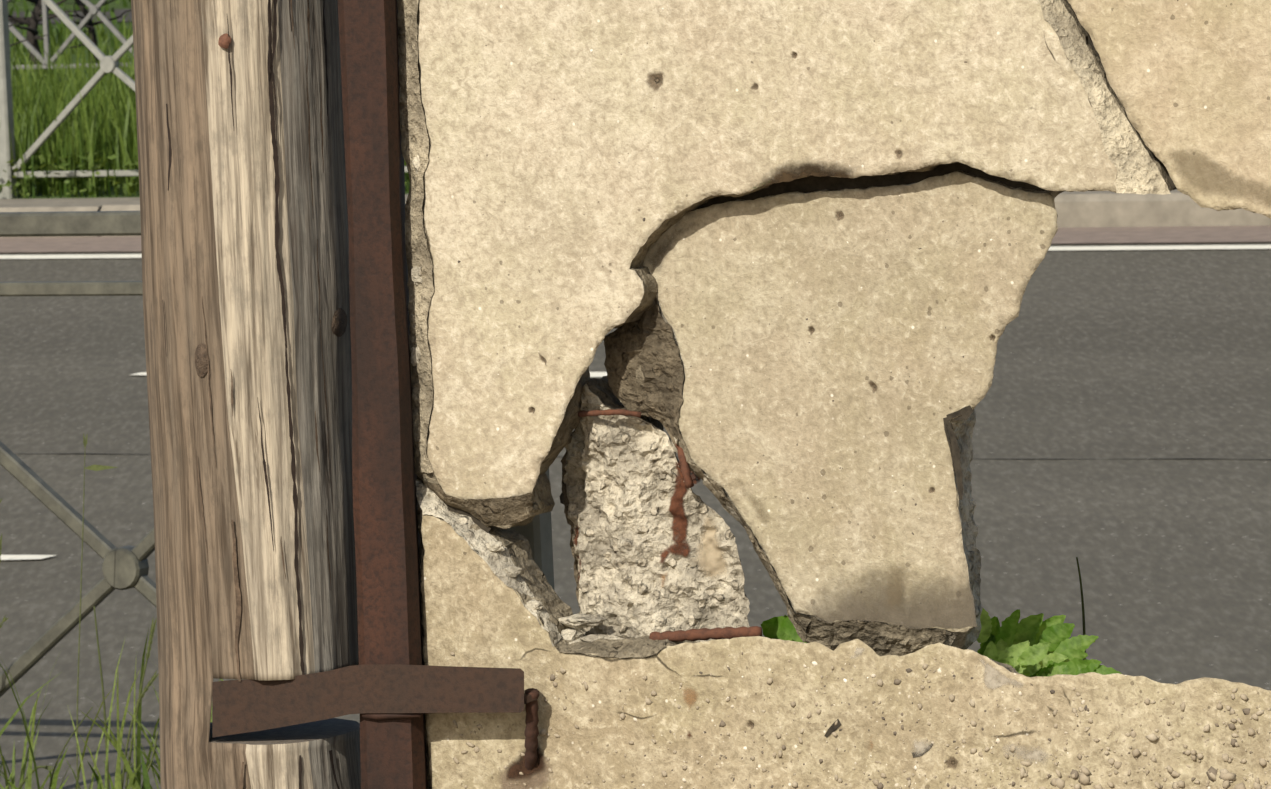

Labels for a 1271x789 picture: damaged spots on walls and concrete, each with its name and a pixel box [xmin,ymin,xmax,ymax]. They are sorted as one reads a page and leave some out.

crack [697,162,1045,209]
crack [1064,0,1176,189]
spalling [397,0,762,658]
rust [660,461,701,578]
spalling [578,298,946,656]
rust [507,747,544,789]